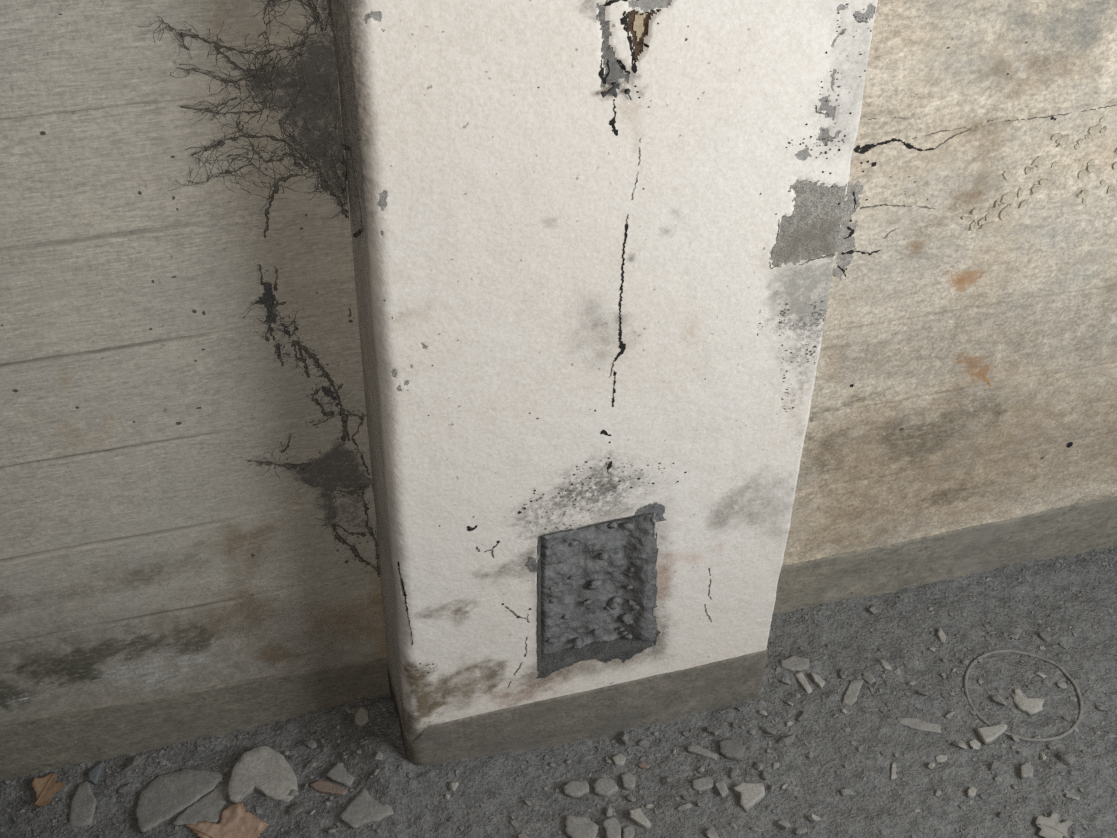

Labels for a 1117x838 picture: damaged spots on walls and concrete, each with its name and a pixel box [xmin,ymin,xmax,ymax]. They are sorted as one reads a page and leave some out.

spalling [596,0,672,136]
peeling [826,3,876,54]
crack [838,105,1115,277]
crack [610,139,641,407]
peeling [769,68,863,412]
spalling [518,457,687,531]
water stain [0,627,214,711]
water stain [404,663,503,736]
spalling [538,664,574,679]
spalling [598,630,661,663]